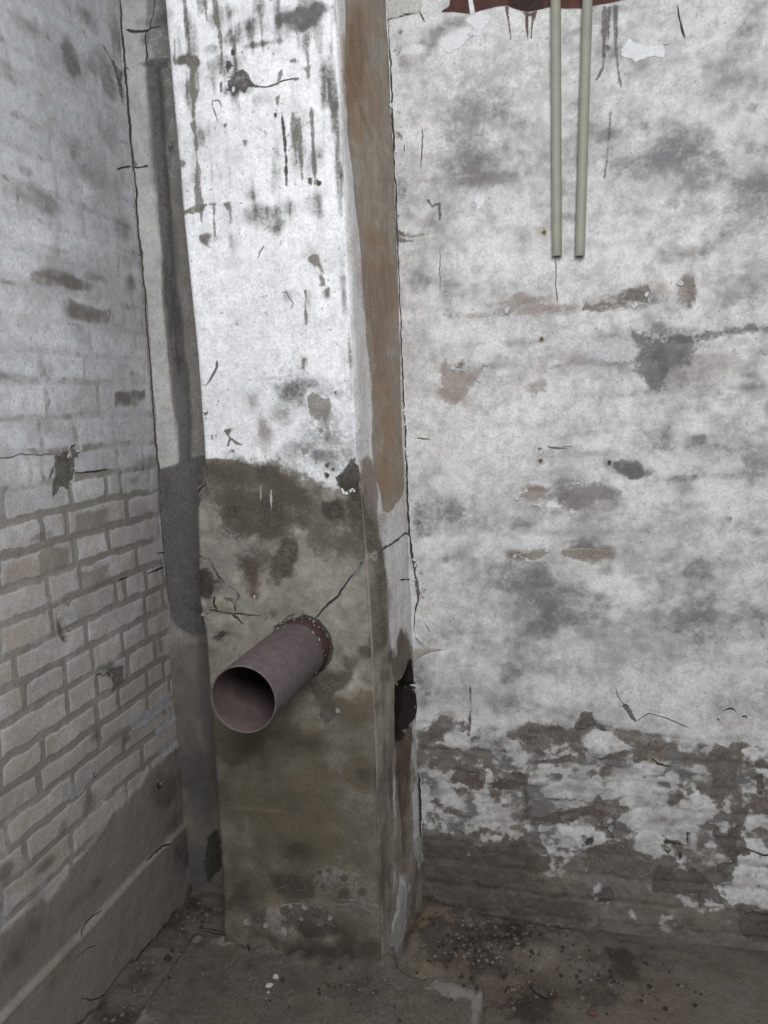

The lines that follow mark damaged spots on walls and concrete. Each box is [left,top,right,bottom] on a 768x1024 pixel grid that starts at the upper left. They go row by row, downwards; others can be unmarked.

spalling [219,61,299,93]
crack [116,0,162,470]
water stain [148,0,392,654]
crack [315,12,430,648]
corrosion [363,264,395,375]
water stain [632,324,768,389]
peeling [49,444,83,496]
crack [196,552,261,624]
spalling [394,658,454,748]
peeling [518,687,689,767]
crack [416,773,424,860]
peeling [451,743,768,943]